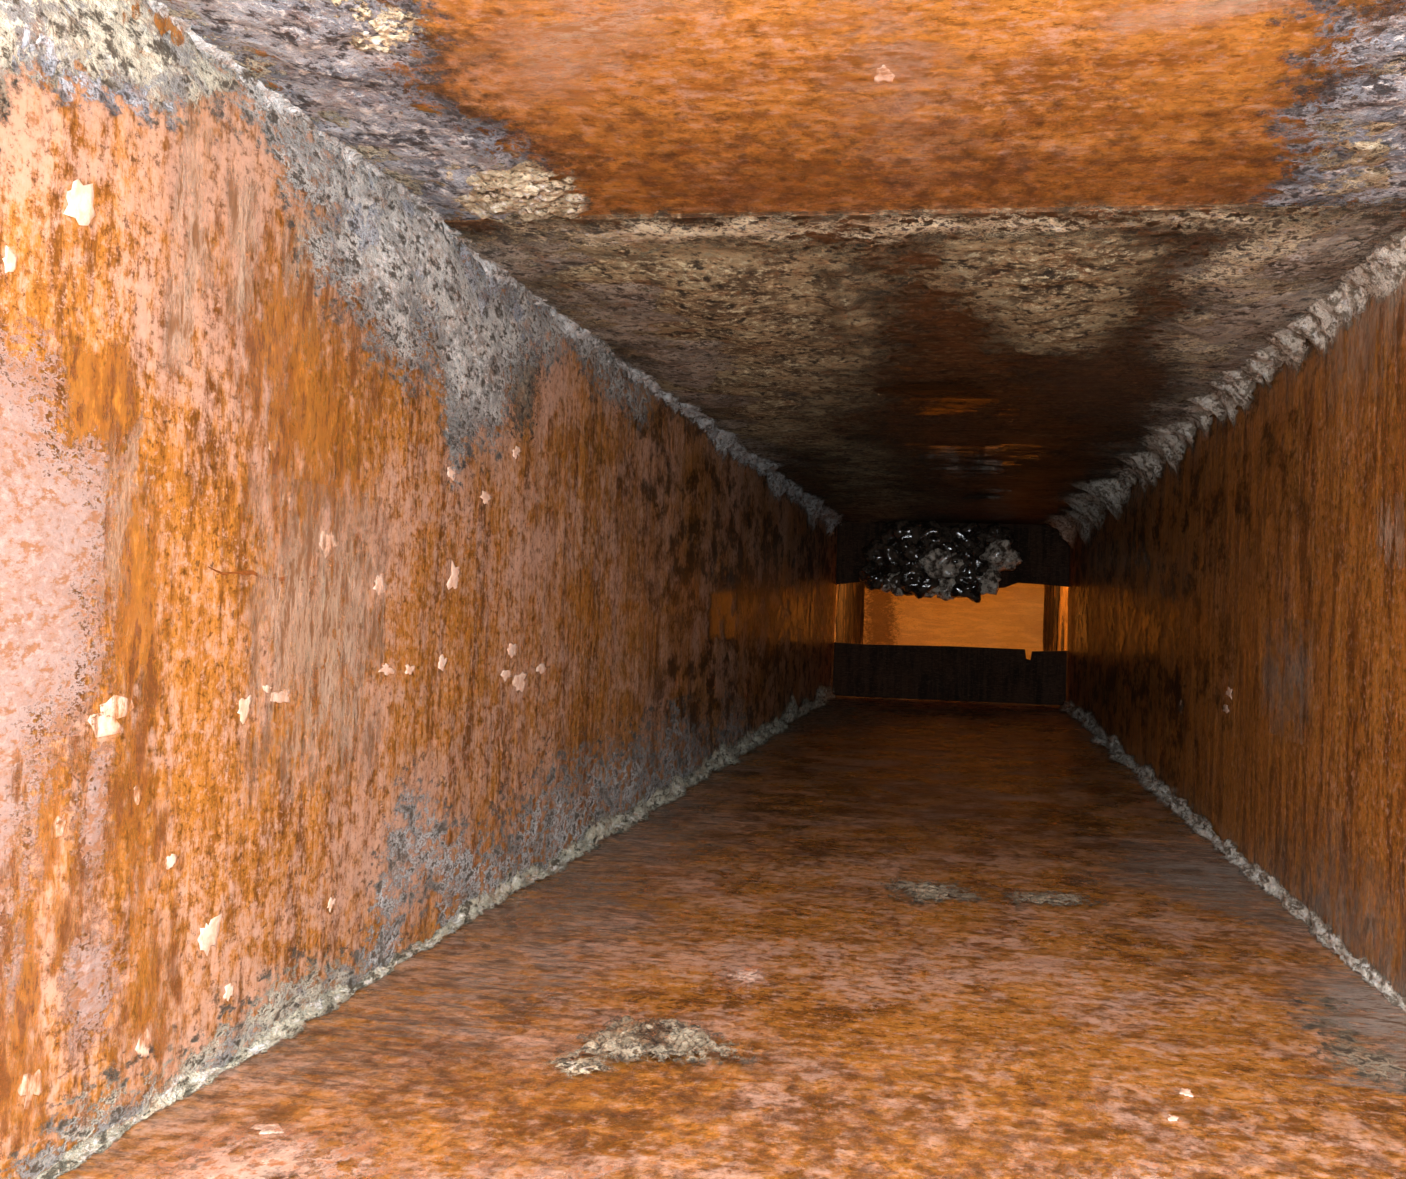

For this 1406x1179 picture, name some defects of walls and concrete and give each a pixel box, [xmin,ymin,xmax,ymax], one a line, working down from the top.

rust [402,32,574,167]
rust [217,193,383,772]
peeling [446,561,460,590]
peeling [378,663,415,675]
peeling [500,643,547,692]
peeling [237,685,290,724]
rust [0,336,186,1160]
peeling [165,854,177,869]
peeling [198,914,222,956]
spalling [540,1015,756,1079]
rust [343,1045,1171,1179]
rust [1199,1152,1316,1179]